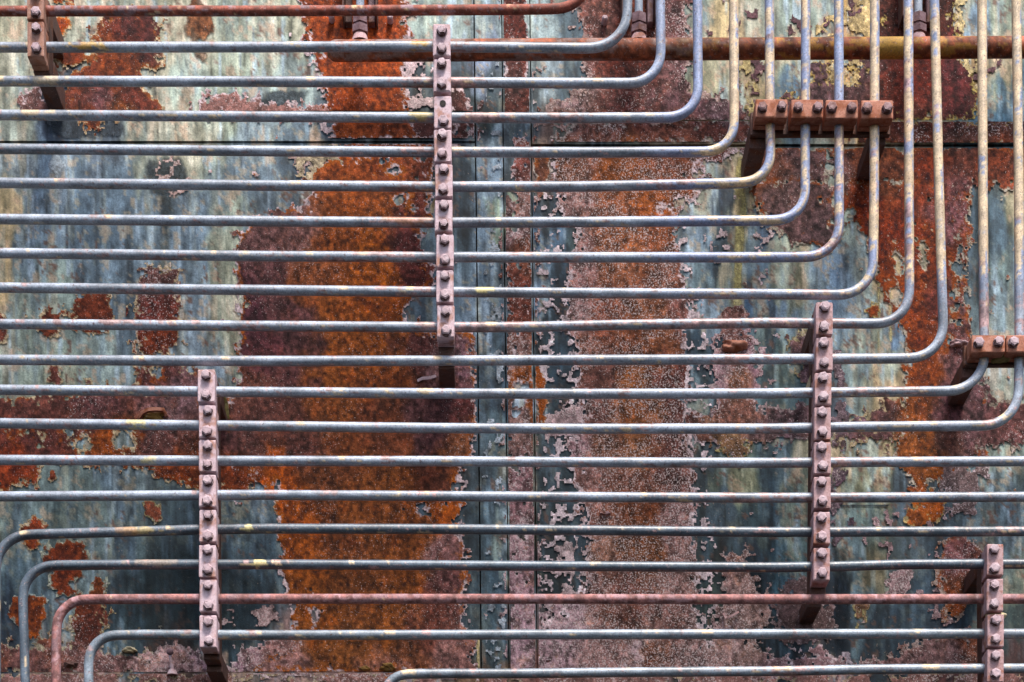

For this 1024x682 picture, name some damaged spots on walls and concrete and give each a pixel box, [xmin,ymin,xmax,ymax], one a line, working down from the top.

corrosion [52,0,168,136]
corrosion [289,0,433,158]
peeling [541,192,567,217]
corrosion [0,262,200,491]
peeling [537,298,585,404]
peeling [685,332,709,351]
corrosion [476,61,983,682]
corrosion [748,59,1024,526]
corrosion [1,514,211,682]
peeling [537,467,589,561]
peeling [541,575,586,594]
peeling [689,487,721,594]